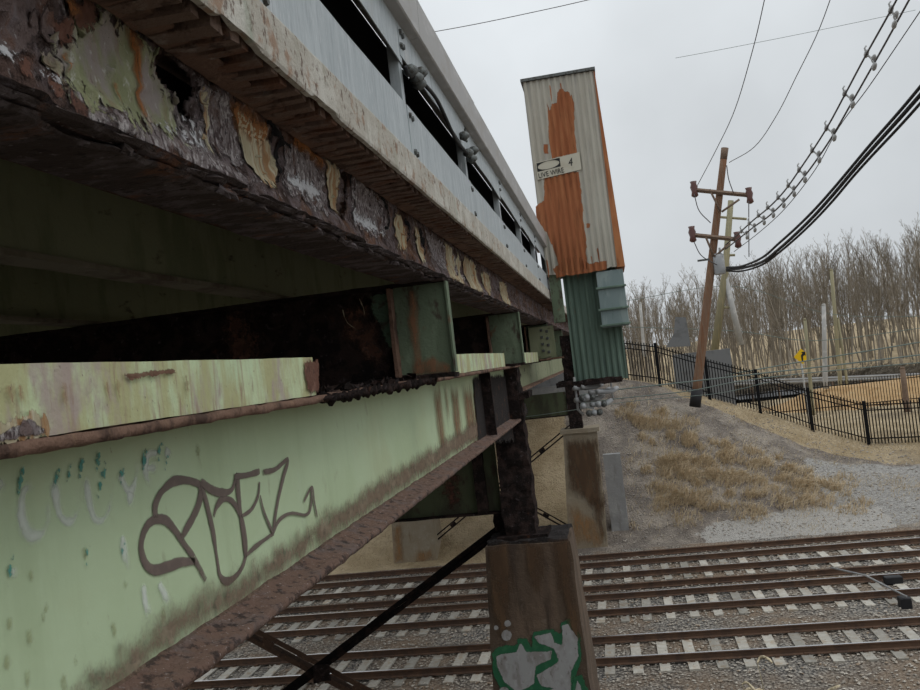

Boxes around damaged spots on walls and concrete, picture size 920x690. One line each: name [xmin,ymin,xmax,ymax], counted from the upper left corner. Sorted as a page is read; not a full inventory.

peeling [40,4,180,141]
corrosion [130,33,147,115]
peeling [199,86,214,154]
peeling [238,109,278,190]
peeling [325,158,341,217]
peeling [394,214,426,264]
peeling [445,243,511,305]
corrosion [544,83,577,159]
corrosion [536,171,607,278]
corrosion [92,292,514,689]